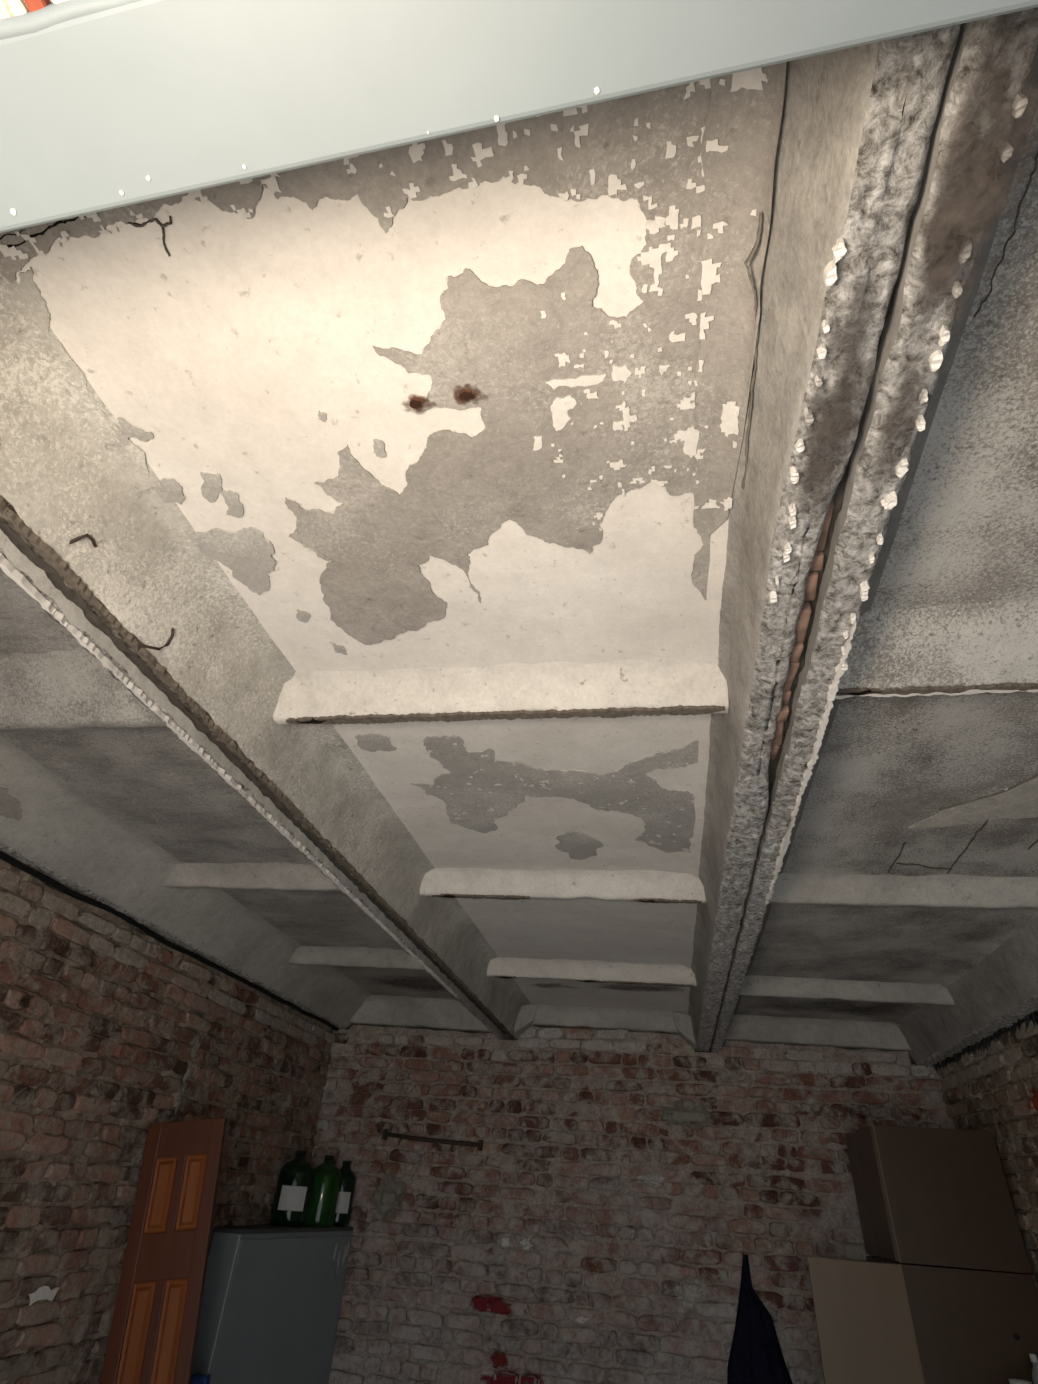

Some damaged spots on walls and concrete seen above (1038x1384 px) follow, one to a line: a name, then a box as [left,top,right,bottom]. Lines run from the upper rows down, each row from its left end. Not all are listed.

damp [916,7,1038,318]
crack [0,216,86,247]
crack [128,216,172,257]
peeling [823,238,847,286]
crack [974,151,1038,318]
peeling [0,62,786,655]
corrosion [403,395,434,413]
corrosion [454,384,479,404]
damp [800,293,869,514]
damp [876,360,919,476]
peeling [769,503,797,603]
peeling [286,705,725,853]